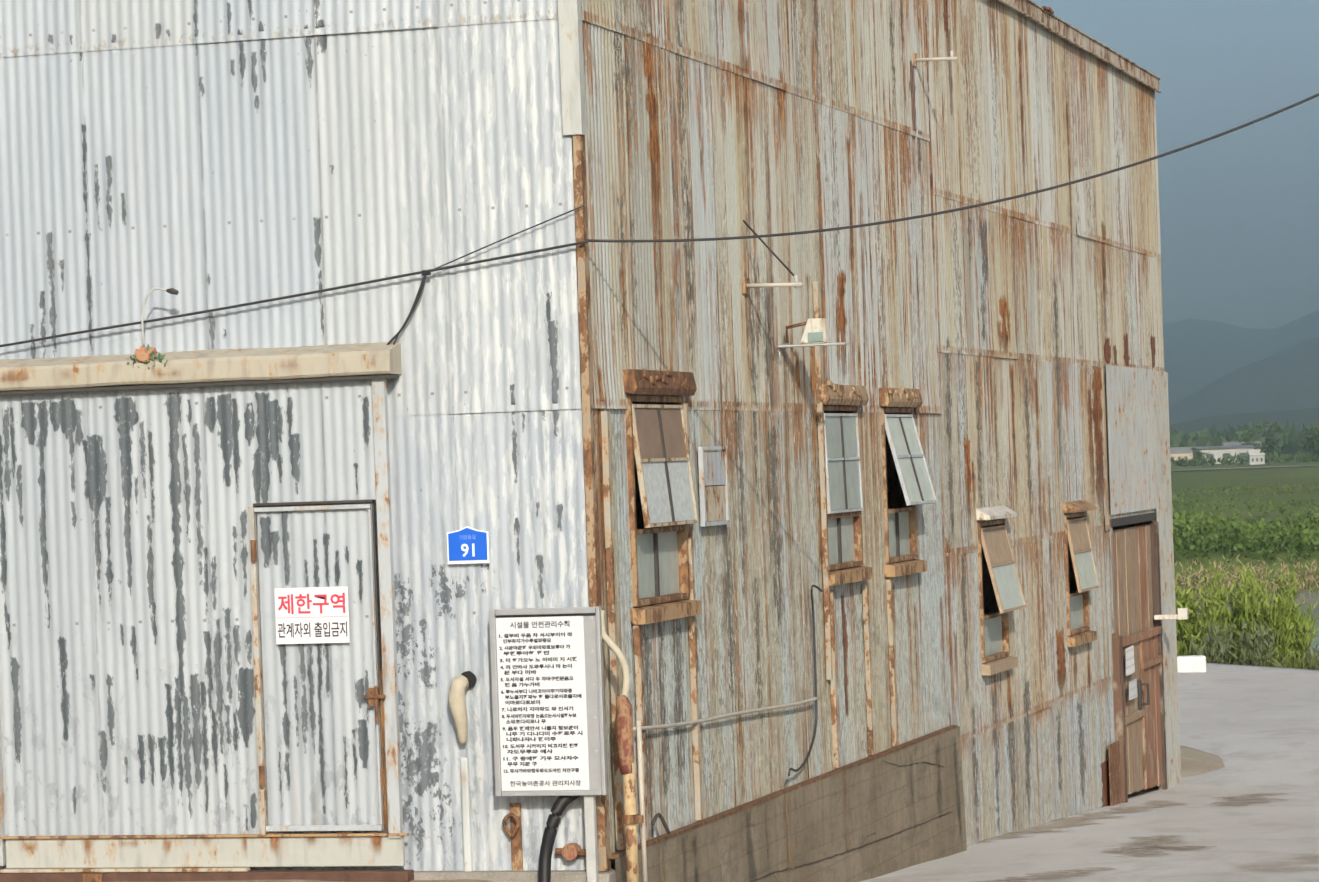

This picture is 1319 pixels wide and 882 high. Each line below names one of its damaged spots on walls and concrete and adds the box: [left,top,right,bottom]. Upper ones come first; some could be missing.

peeling [226,0,267,112]
rust [644,33,659,175]
peeling [81,124,127,355]
rust [836,140,854,356]
rust [964,438,975,505]
rust [1088,333,1130,483]
peeling [0,392,363,818]
peeling [394,563,490,687]
rust [830,594,848,715]
peeling [343,670,371,809]
peeling [398,692,454,864]
crack [728,811,953,882]